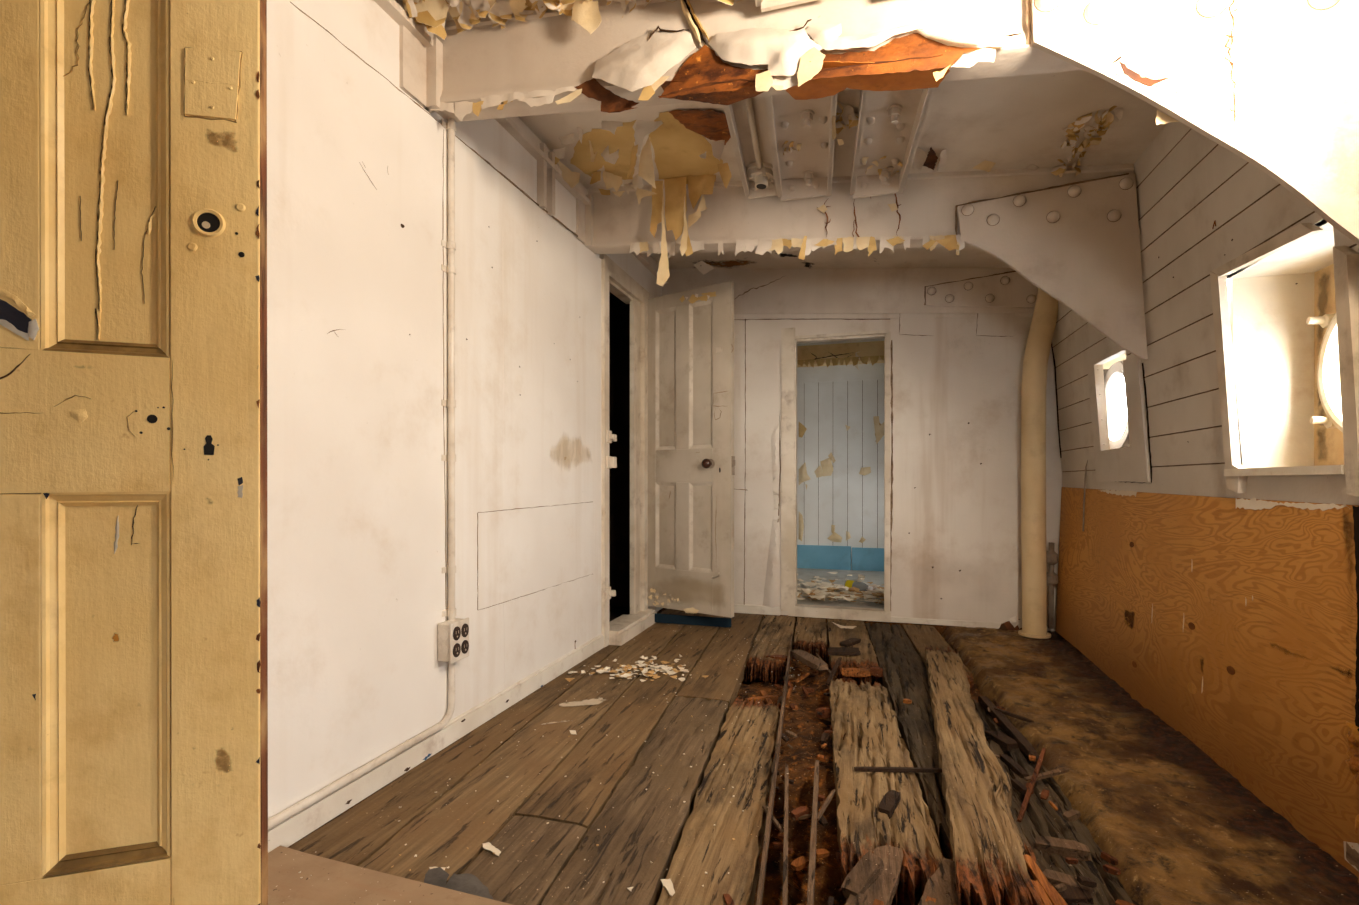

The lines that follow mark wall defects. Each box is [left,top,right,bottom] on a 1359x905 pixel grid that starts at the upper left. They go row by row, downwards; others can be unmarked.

peeling [402,0,677,40]
peeling [1108,53,1179,93]
crack [1223,0,1239,139]
peeling [1155,110,1179,125]
peeling [431,19,1021,287]
peeling [1051,106,1123,177]
spalling [255,0,268,905]
peeling [647,588,699,614]
peeling [482,842,501,856]
peeling [1346,842,1359,871]
peeling [660,879,675,896]